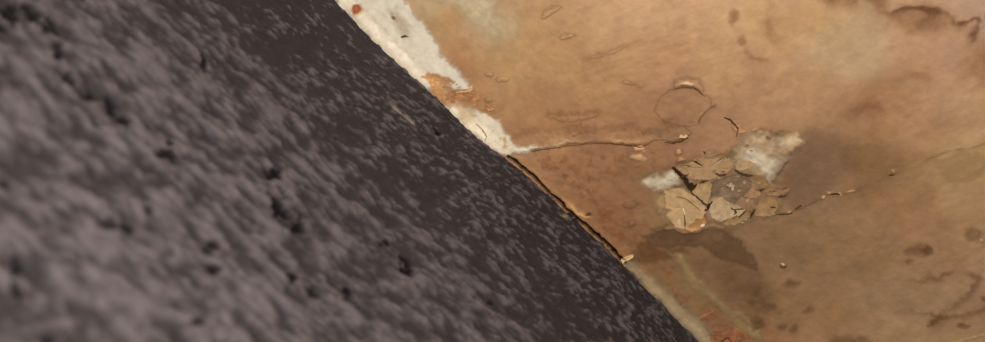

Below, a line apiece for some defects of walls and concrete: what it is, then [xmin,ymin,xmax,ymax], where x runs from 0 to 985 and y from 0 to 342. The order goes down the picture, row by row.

leakage [894,6,941,22]
peeling [445,77,716,155]
spalling [642,117,803,234]
leakage [632,227,764,340]